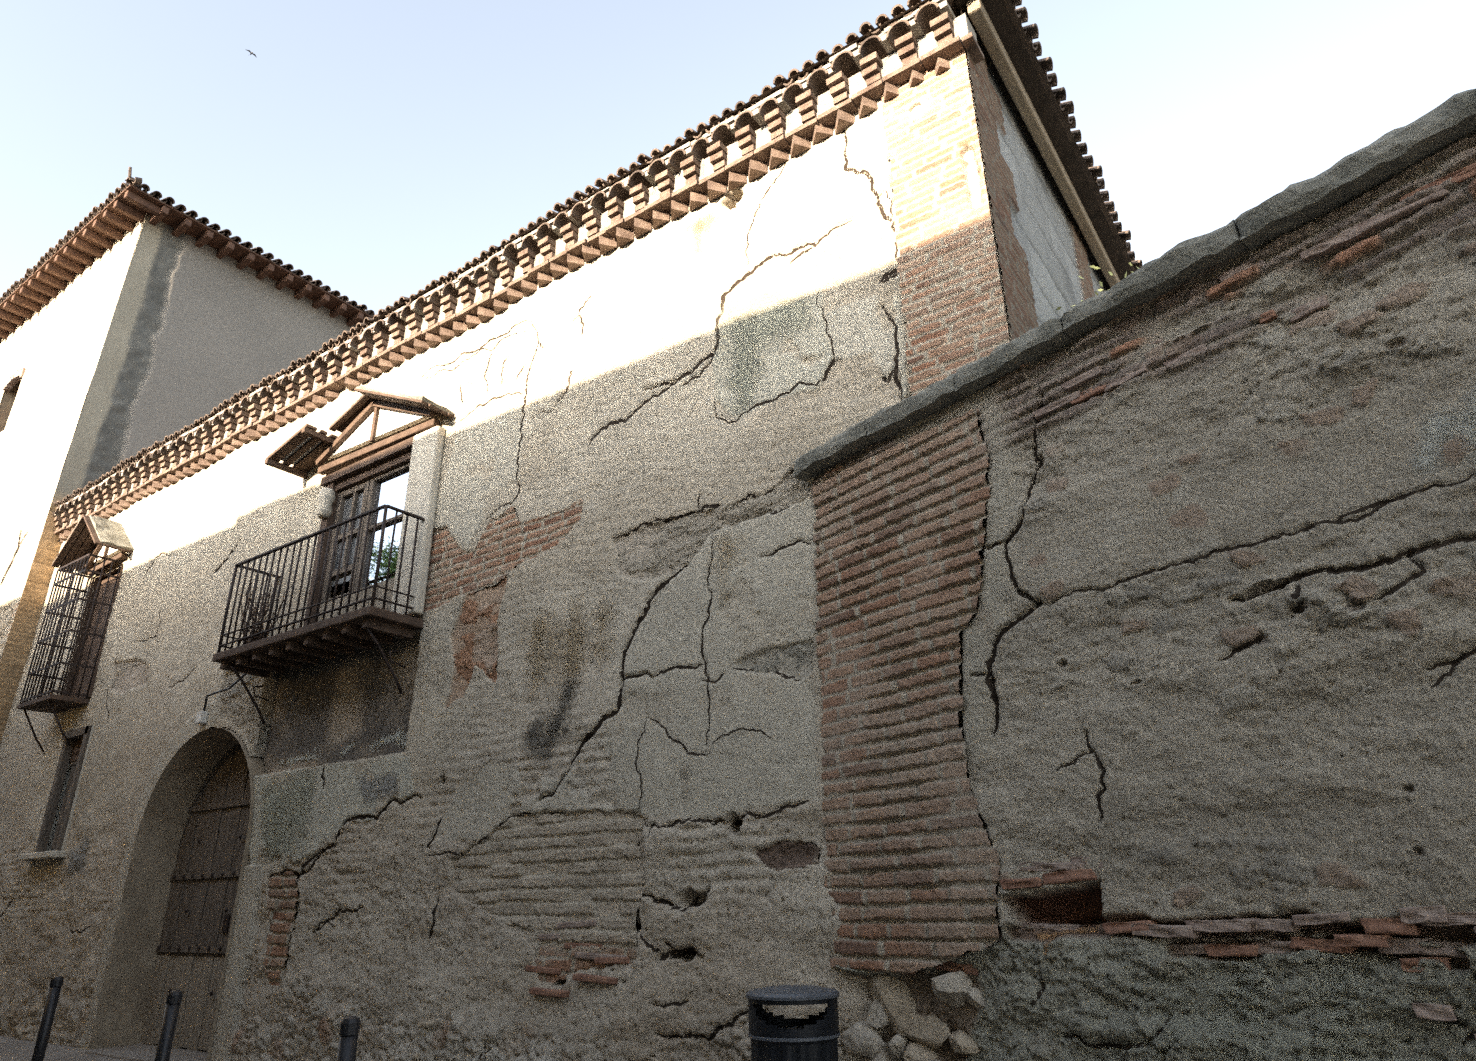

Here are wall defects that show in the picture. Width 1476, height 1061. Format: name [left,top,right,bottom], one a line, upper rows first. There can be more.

crack [420,320,573,518]
crack [589,131,903,447]
flaking render [1032,344,1206,421]
flaking render [1299,162,1476,263]
flaking render [423,499,583,691]
crack [269,469,811,879]
crack [974,391,1476,734]
crack [313,906,362,933]
flaking render [451,811,645,998]
spalling [756,841,820,871]
crack [1057,733,1106,821]
flaking render [1102,905,1476,972]